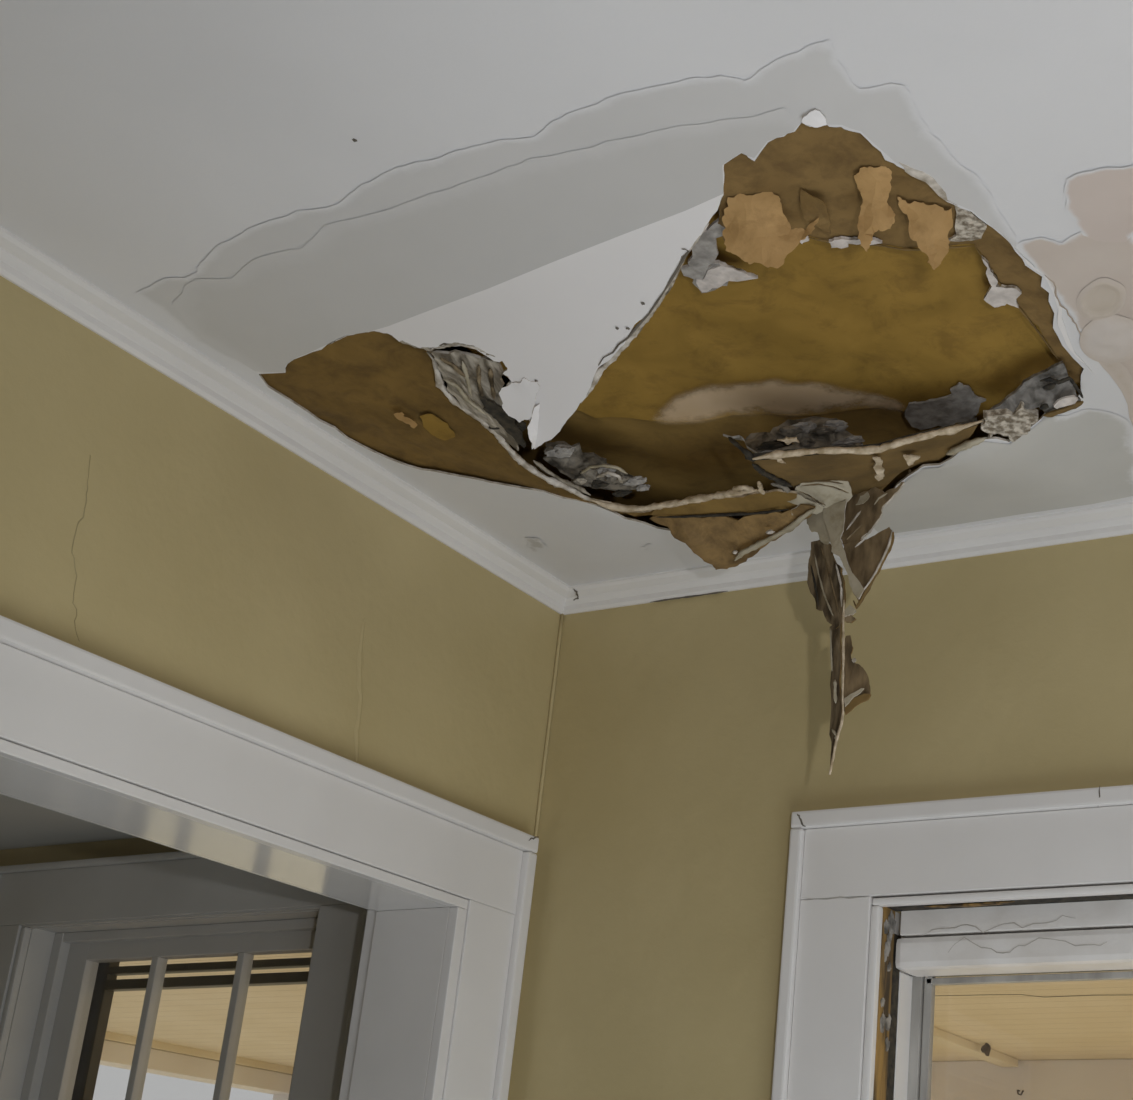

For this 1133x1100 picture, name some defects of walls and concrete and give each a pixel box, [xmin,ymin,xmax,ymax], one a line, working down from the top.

peeling [802,109,827,128]
water stain [136,40,1133,373]
peeling [829,236,882,249]
peeling [982,256,1022,308]
peeling [261,331,758,514]
spalling [752,420,983,481]
water stain [874,357,1133,533]
peeling [1039,383,1078,410]
peeling [732,508,816,561]